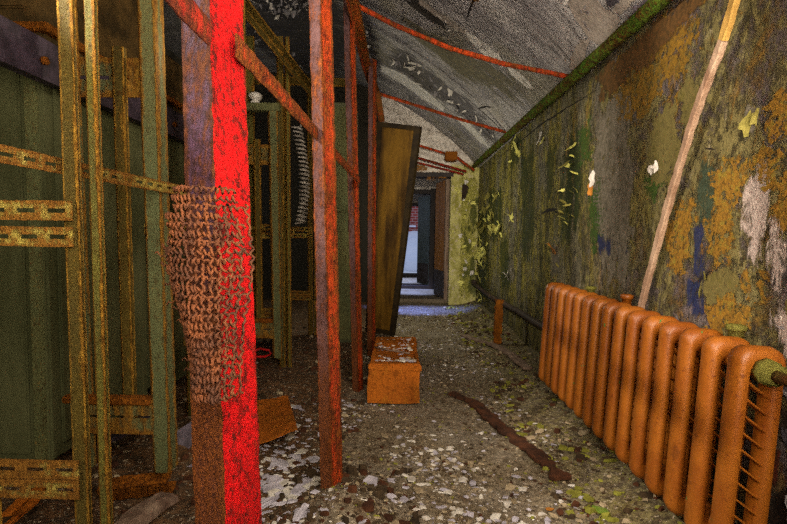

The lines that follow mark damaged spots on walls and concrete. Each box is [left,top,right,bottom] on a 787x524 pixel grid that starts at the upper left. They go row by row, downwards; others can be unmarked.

damp [595,0,707,102]
damp [521,145,535,258]
damp [567,117,593,245]
flaking render [554,0,703,294]
peeling [665,87,787,334]
damp [740,162,787,291]
flaking render [770,299,787,357]